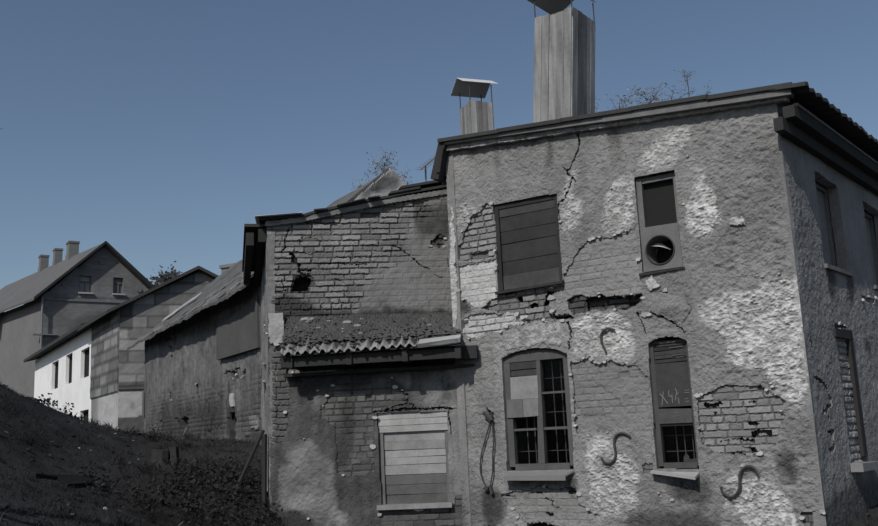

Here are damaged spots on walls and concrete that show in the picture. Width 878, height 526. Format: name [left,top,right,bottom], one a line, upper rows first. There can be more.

crack [275,222,371,292]
flaking render [429,122,746,524]
flaking render [693,273,826,526]